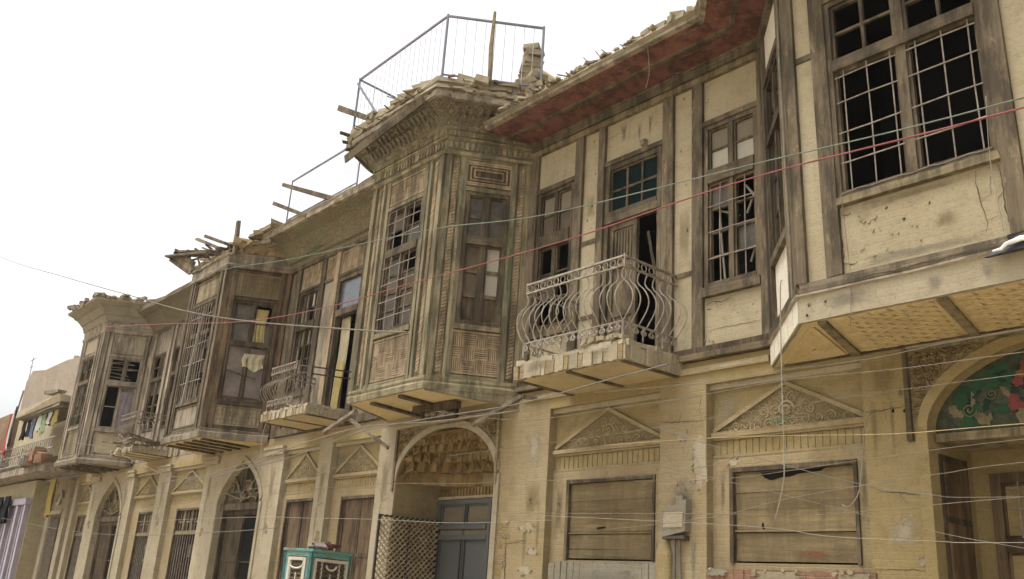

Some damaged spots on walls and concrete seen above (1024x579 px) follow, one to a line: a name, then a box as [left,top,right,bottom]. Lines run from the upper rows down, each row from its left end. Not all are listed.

crack [840,164,1009,281]
spalling [690,435,708,491]